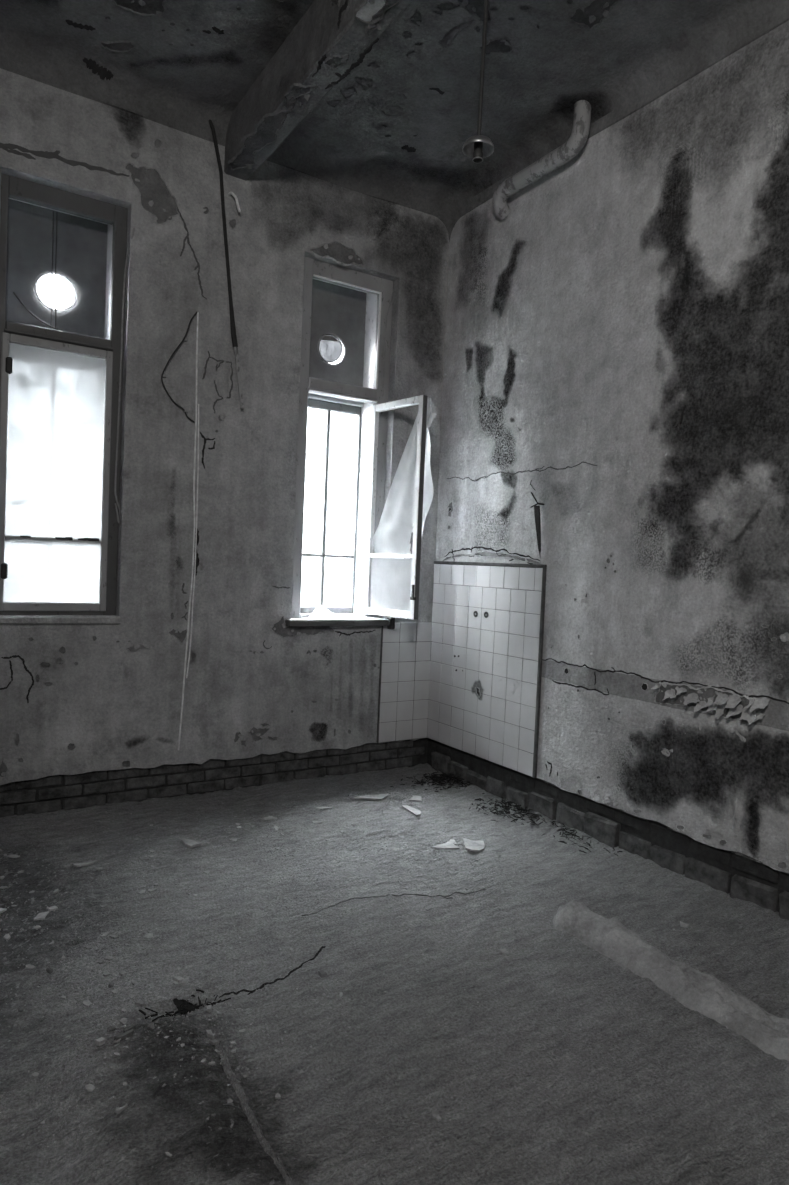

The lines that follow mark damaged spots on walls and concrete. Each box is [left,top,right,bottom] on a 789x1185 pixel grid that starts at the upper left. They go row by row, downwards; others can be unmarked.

flaking render [354,0,389,23]
peeling [403,0,532,57]
crack [0,143,133,177]
peeling [123,152,180,225]
damp [480,242,523,315]
damp [624,21,789,693]
crack [200,351,233,469]
damp [466,345,521,551]
crack [447,461,597,490]
peeling [641,682,769,742]
damp [617,721,789,855]
crack [219,946,326,998]